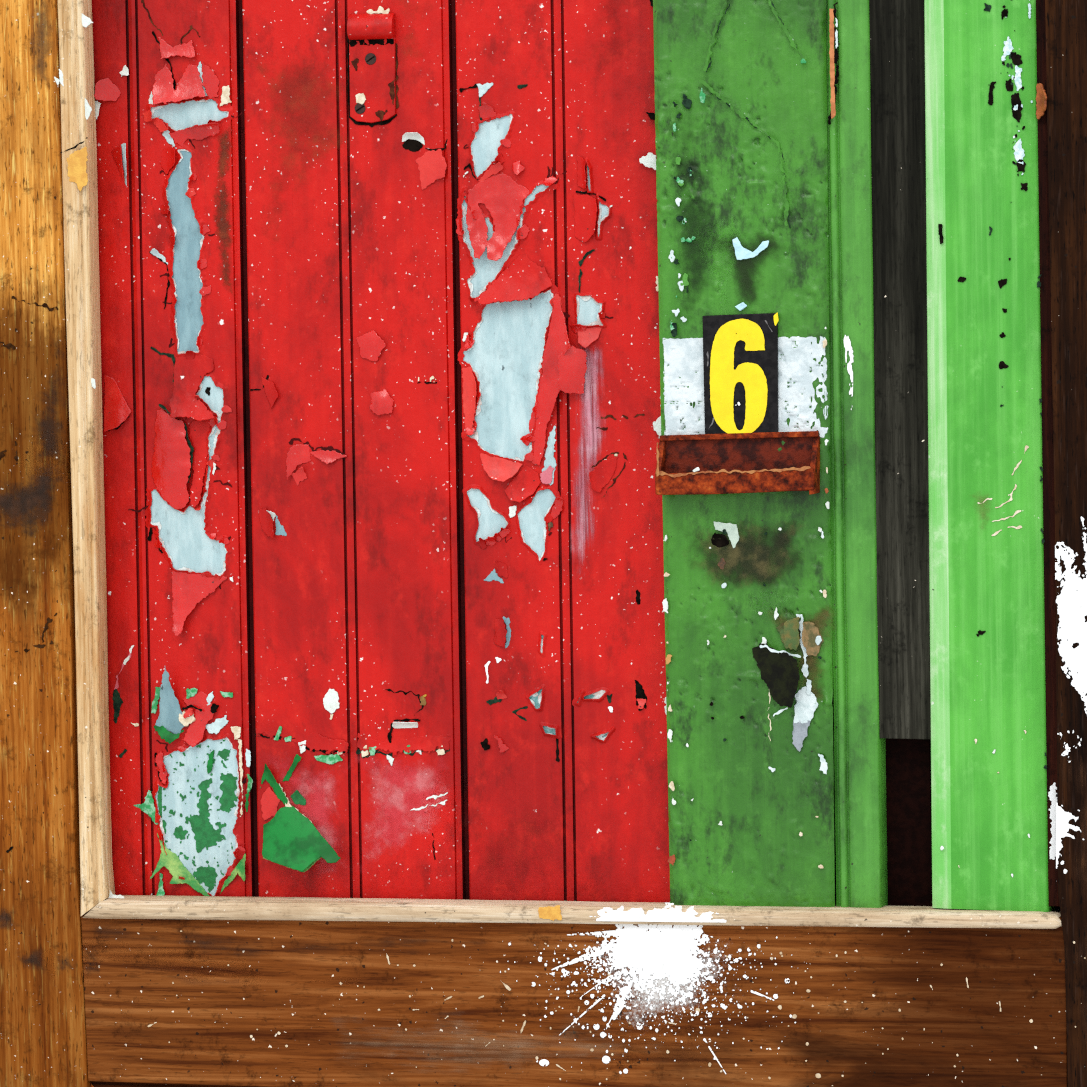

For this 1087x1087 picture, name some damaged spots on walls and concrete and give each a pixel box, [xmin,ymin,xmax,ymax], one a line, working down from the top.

peeling [85,65,129,120]
peeling [988,30,1033,191]
peeling [128,31,242,636]
peeling [456,83,613,566]
peeling [669,236,695,337]
peeling [134,666,341,896]
peeling [383,689,427,743]
peeling [512,684,562,762]
peeling [572,687,613,712]
peeling [635,680,647,711]
peeling [752,607,824,752]
peeling [818,754,828,774]